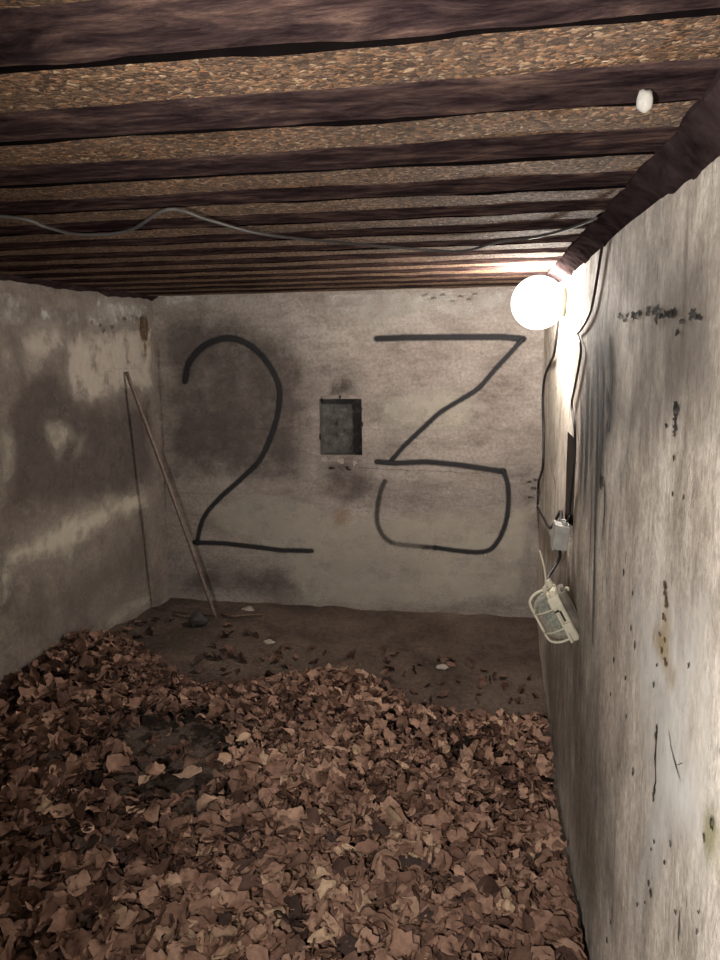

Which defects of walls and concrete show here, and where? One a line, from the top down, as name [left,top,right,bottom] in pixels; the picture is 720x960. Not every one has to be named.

damp [1,362,150,599]
damp [580,321,613,623]
rust [658,581,668,667]
crack [652,726,682,802]